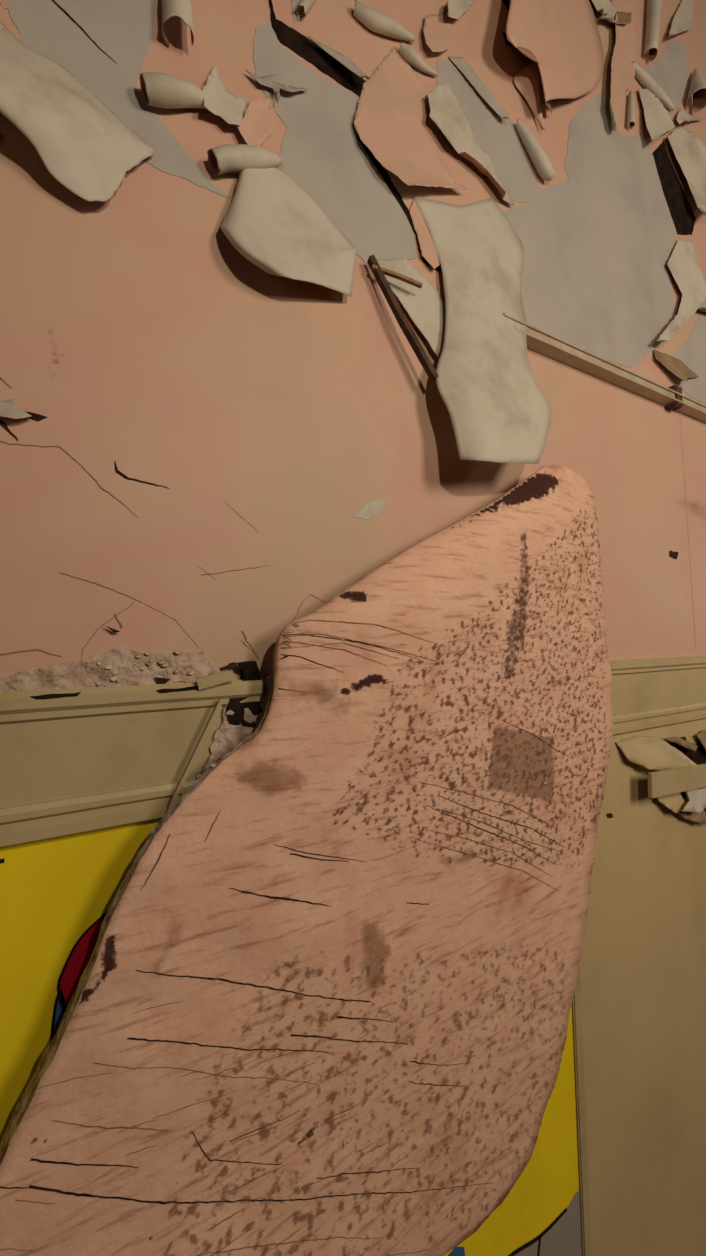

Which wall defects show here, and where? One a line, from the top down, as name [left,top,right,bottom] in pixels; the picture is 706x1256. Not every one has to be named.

peeling [0,0,706,464]
spalling [0,626,215,699]
spalling [196,672,272,779]
spalling [615,730,706,824]